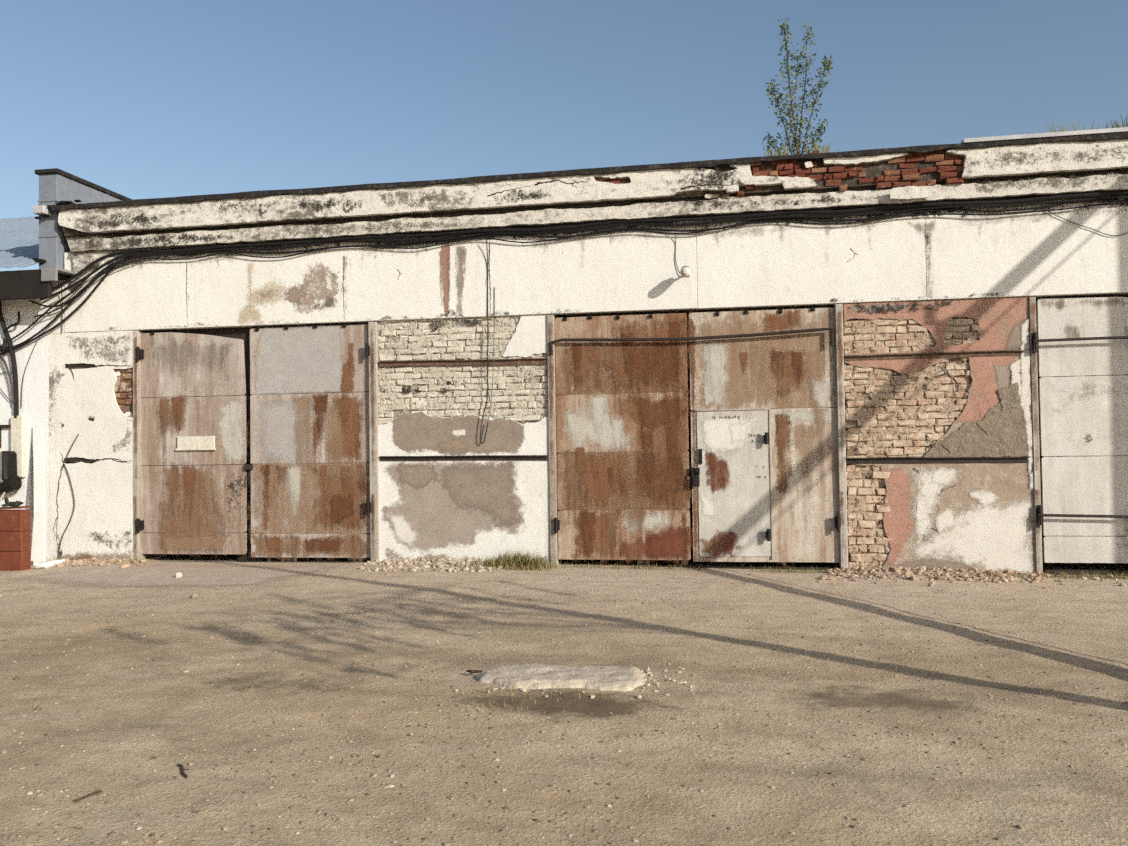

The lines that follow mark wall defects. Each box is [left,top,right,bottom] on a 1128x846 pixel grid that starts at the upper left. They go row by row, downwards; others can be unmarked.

water stain [68,213,241,268]
water stain [214,198,497,323]
rust [440,245,450,317]
water stain [495,189,550,203]
water stain [687,168,890,237]
spalling [678,149,965,199]
crack [65,364,131,379]
spalling [67,331,133,417]
rust [252,332,375,559]
spalling [378,309,548,550]
rust [548,310,842,563]
spalling [843,297,1029,570]